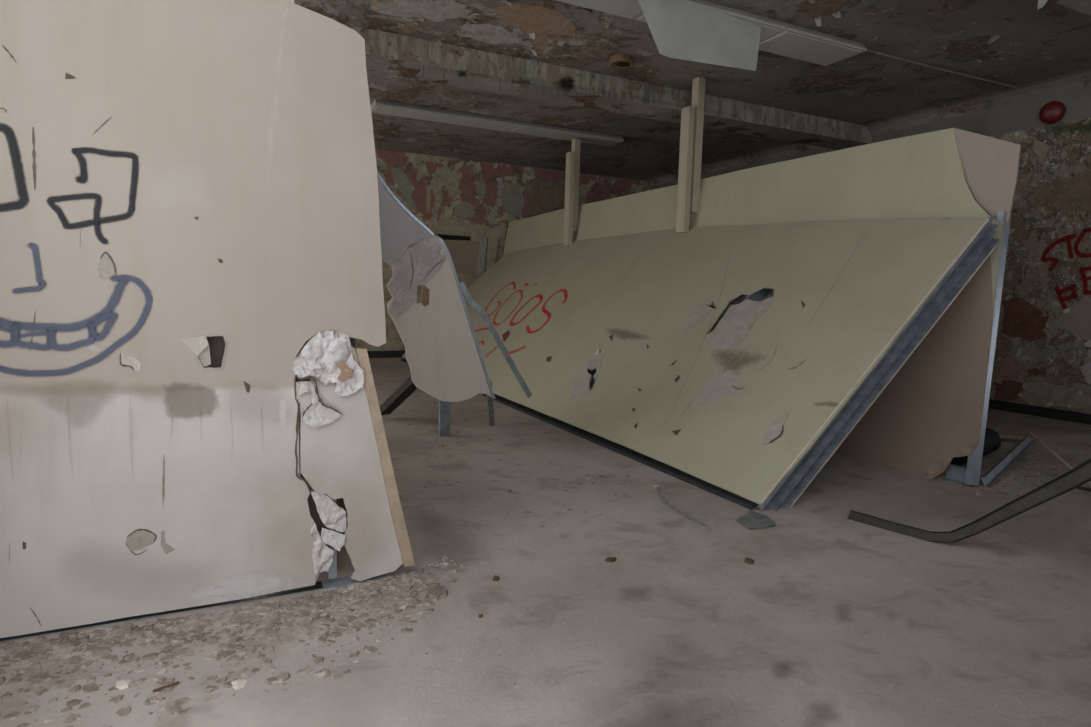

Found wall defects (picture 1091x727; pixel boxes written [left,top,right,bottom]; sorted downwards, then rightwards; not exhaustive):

peeling [370,0,621,62]
peeling [390,154,510,241]
peeling [525,177,565,217]
spalling [994,294,1091,410]
crack [294,375,343,492]